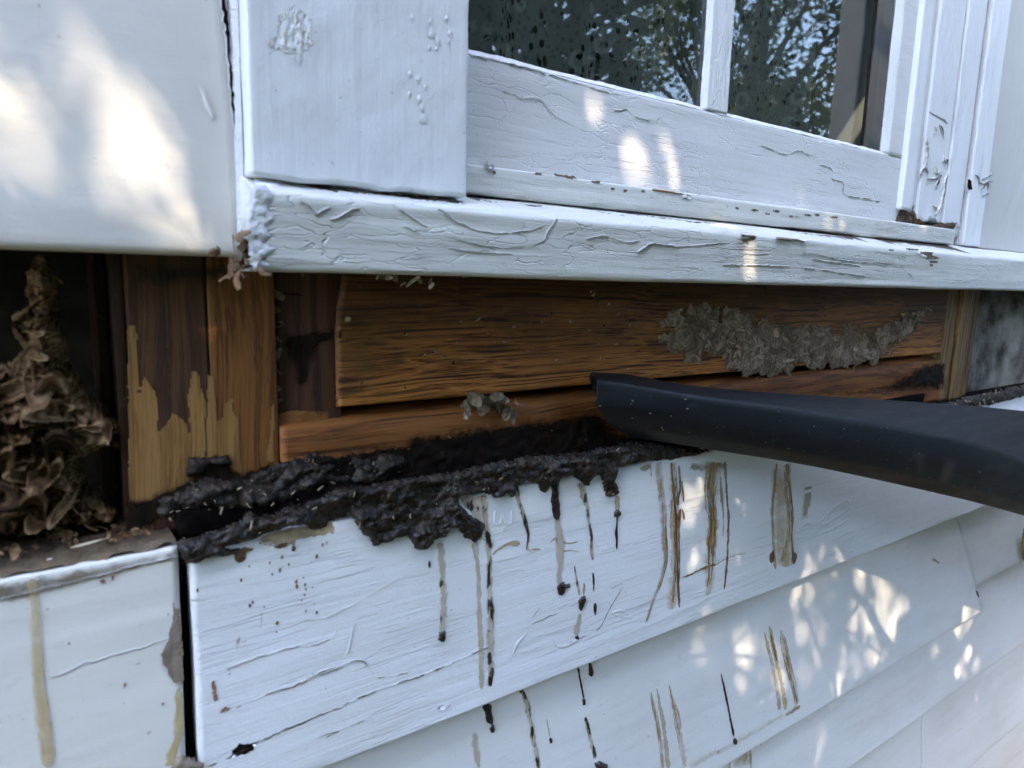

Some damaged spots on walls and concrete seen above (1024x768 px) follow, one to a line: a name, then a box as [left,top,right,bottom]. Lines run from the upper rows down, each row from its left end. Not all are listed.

crack [471,54,660,129]
crack [761,145,880,203]
peeling [919,125,949,216]
crack [299,184,972,277]
peeling [126,325,242,503]
leakage [125,456,286,530]
peeling [264,404,275,462]
leakage [277,416,626,509]
leakage [27,579,54,768]
peeling [161,602,184,683]
crack [205,568,494,767]
leakage [438,579,446,642]